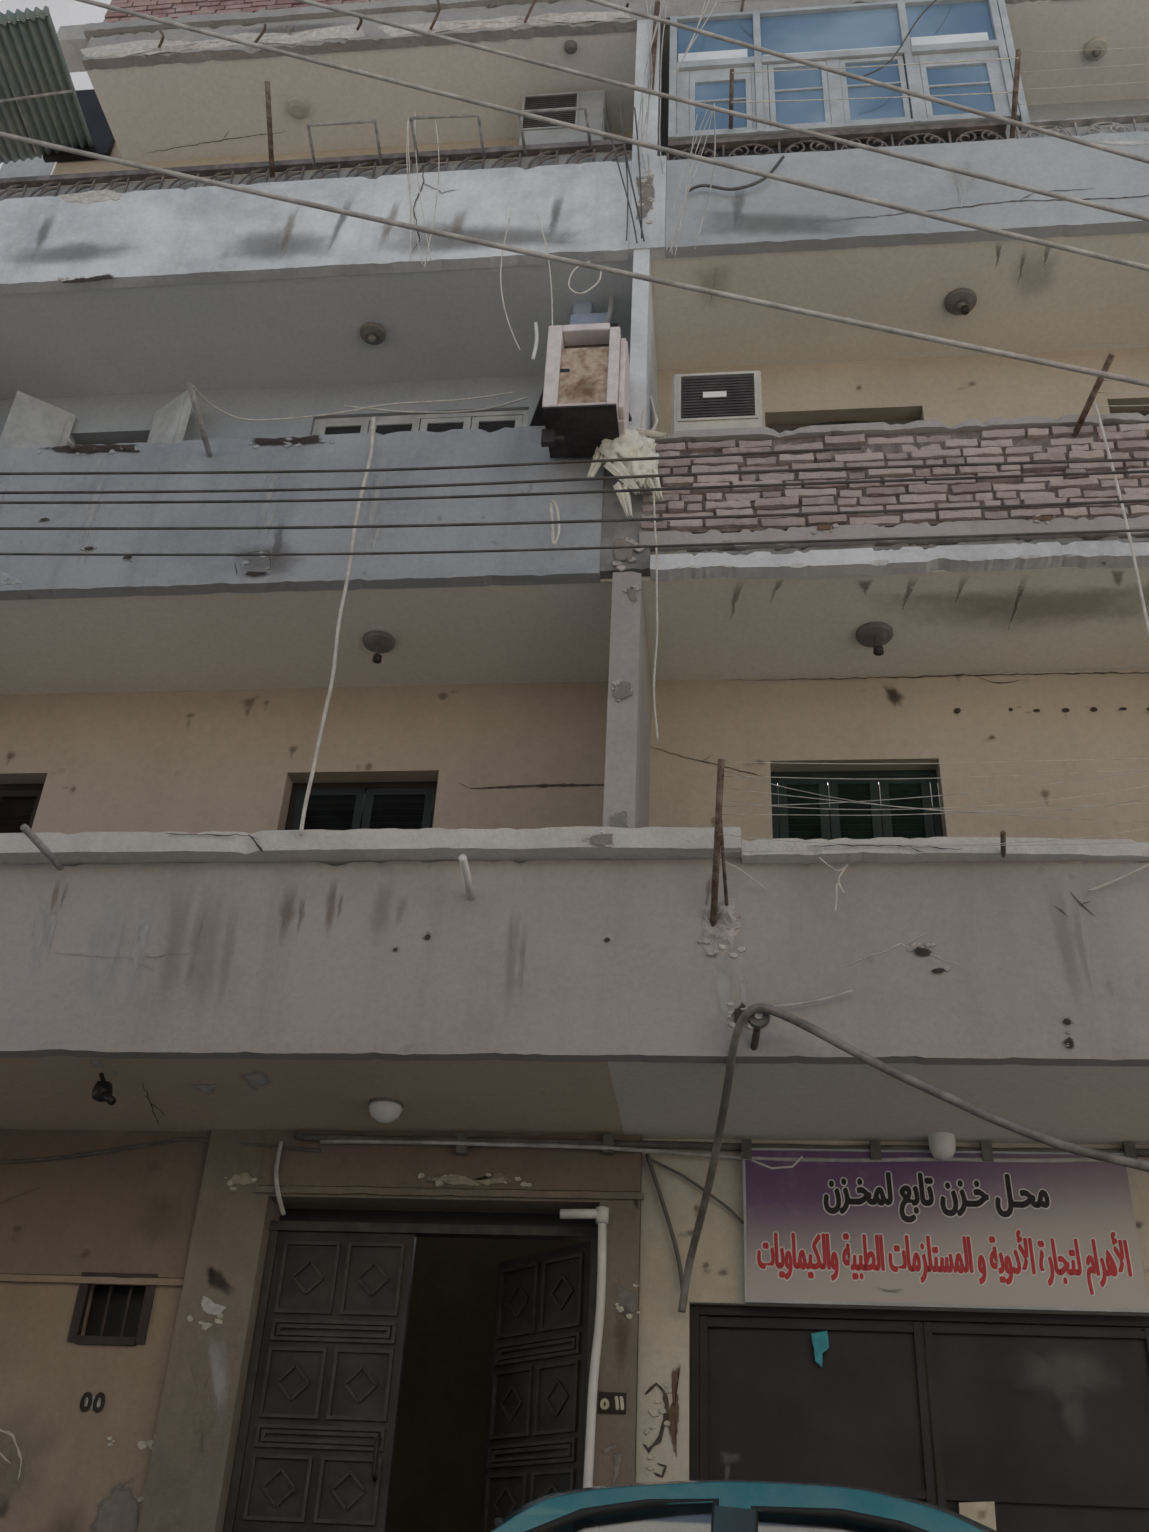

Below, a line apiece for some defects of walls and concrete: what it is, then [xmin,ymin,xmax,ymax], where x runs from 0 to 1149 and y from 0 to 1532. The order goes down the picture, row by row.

spalling [80,0,631,58]
crack [837,188,1148,221]
crack [652,747,763,777]
crack [460,782,604,790]
spalling [187,1296,226,1330]